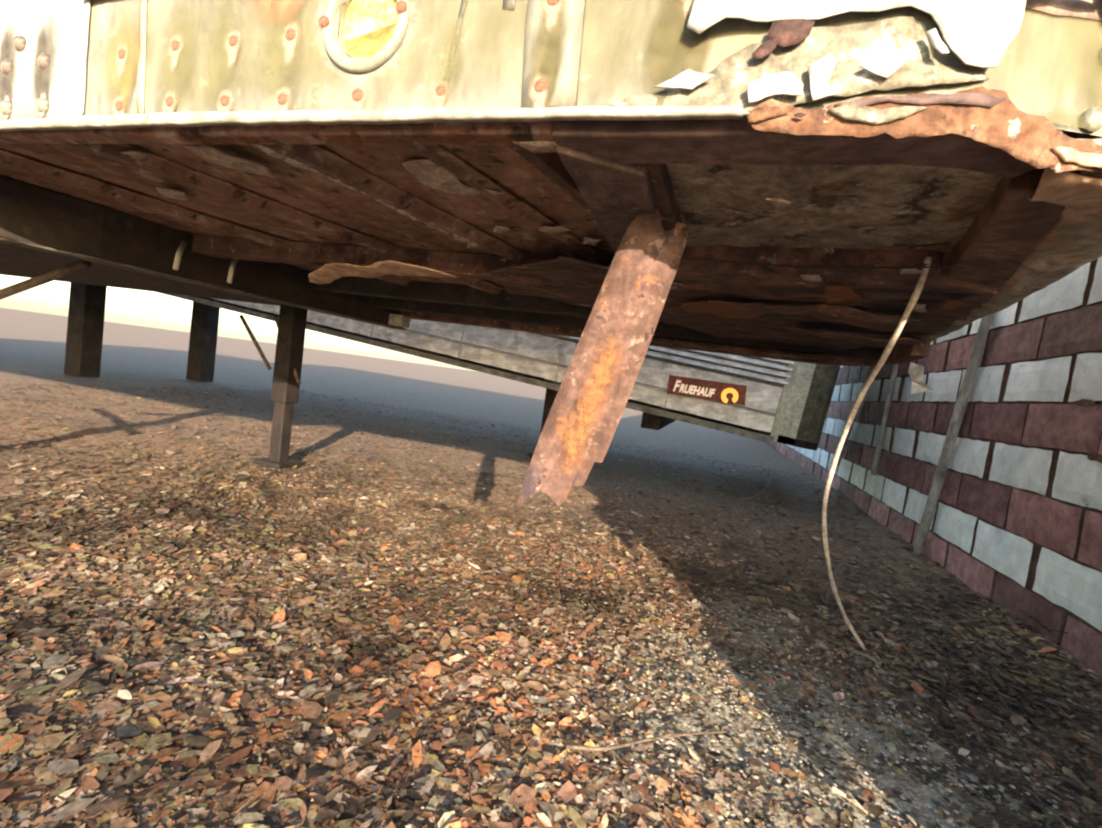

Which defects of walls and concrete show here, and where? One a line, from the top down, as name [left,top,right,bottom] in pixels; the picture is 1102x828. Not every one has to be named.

corrosion [564,341,620,465]